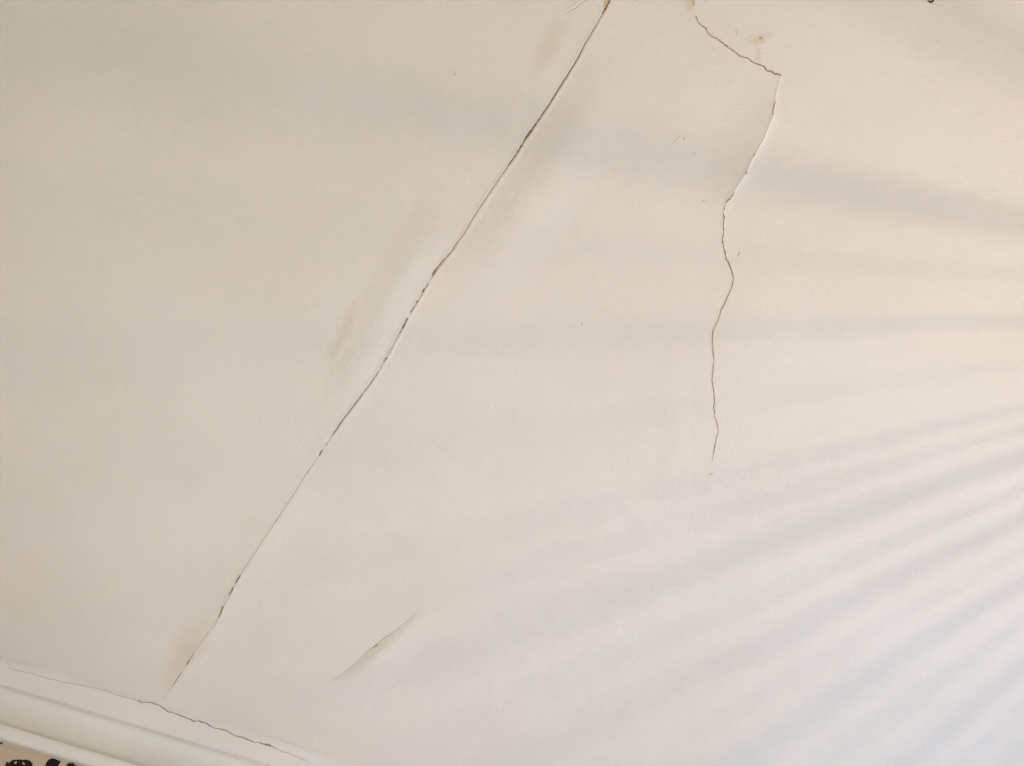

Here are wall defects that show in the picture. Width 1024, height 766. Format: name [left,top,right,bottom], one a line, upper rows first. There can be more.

crack [692,1,781,76]
crack [9,0,611,763]
crack [705,153,756,498]